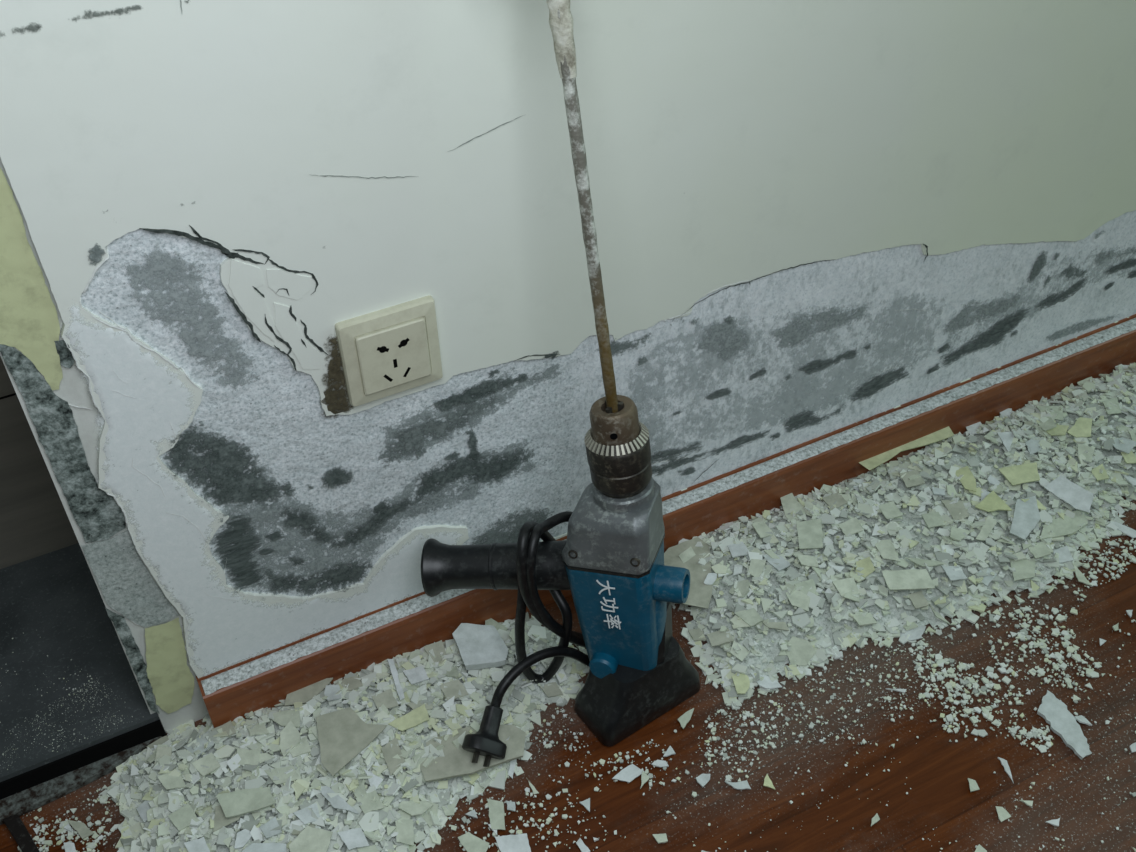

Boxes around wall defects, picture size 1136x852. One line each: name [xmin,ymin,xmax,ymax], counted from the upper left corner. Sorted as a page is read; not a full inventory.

crack [139,225,328,370]
water stain [321,337,353,418]
water stain [165,351,561,595]
flaking render [0,210,1136,676]
water stain [598,231,1136,475]
spalling [104,595,160,714]